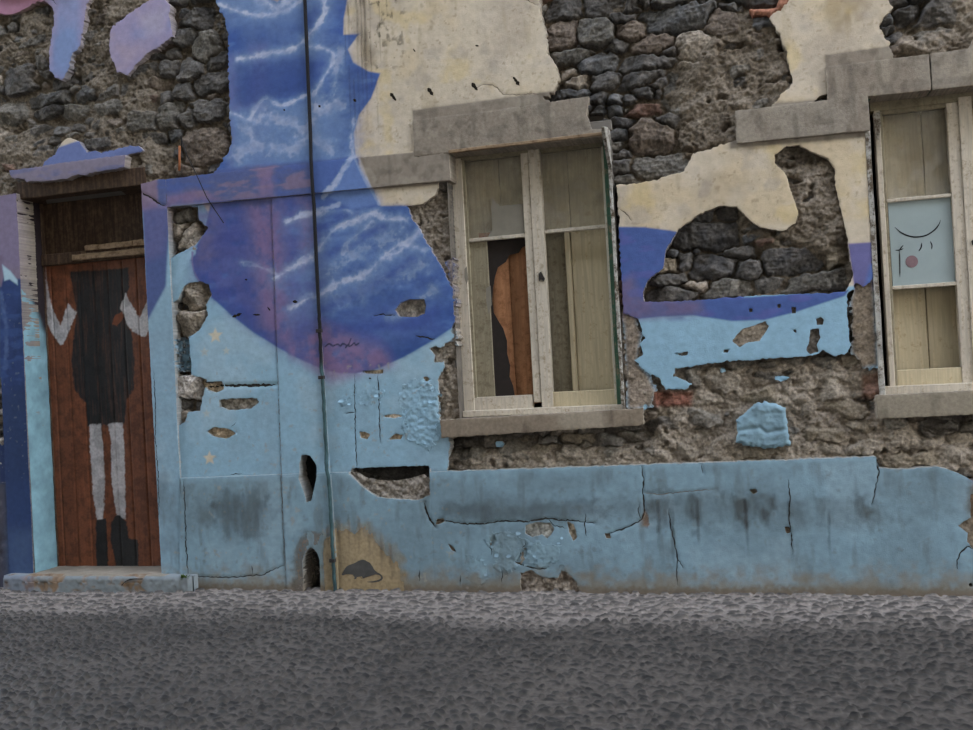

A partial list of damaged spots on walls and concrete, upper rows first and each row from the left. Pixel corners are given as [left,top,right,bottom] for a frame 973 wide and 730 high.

spalling [0,0,232,196]
spalling [173,207,208,254]
spalling [409,182,456,286]
spalling [448,0,973,479]
spalling [172,282,259,423]
spalling [397,299,426,317]
peeling [385,340,460,451]
spalling [351,465,430,500]
crack [424,503,593,581]
crack [614,466,713,585]
spalling [958,494,973,548]